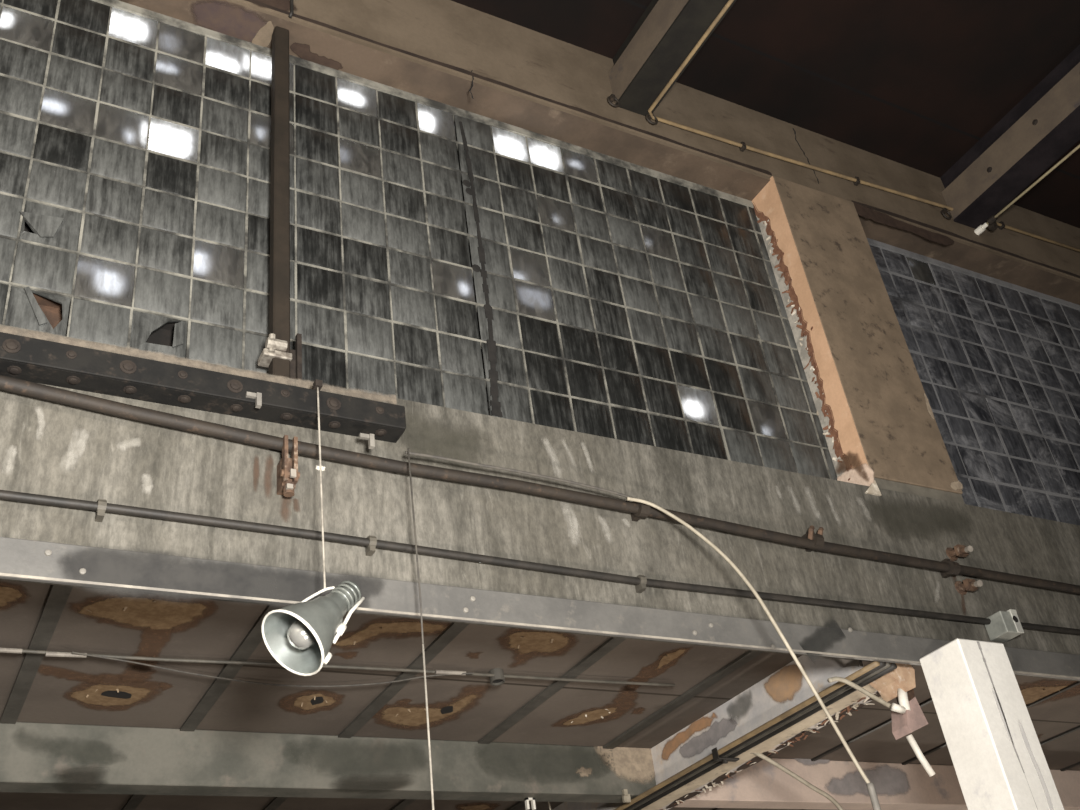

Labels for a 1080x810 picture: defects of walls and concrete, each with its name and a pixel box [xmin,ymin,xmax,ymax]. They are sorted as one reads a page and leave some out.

peeling [252,21,274,47]
peeling [38,550,381,714]
peeling [332,618,450,659]
peeling [498,628,576,667]
peeling [373,685,489,730]
peeling [553,648,690,727]
peeling [764,665,802,702]
peeling [597,713,737,783]
peeling [661,692,883,810]
leakage [60,766,102,792]
leakage [339,776,410,792]
peeling [826,765,910,796]